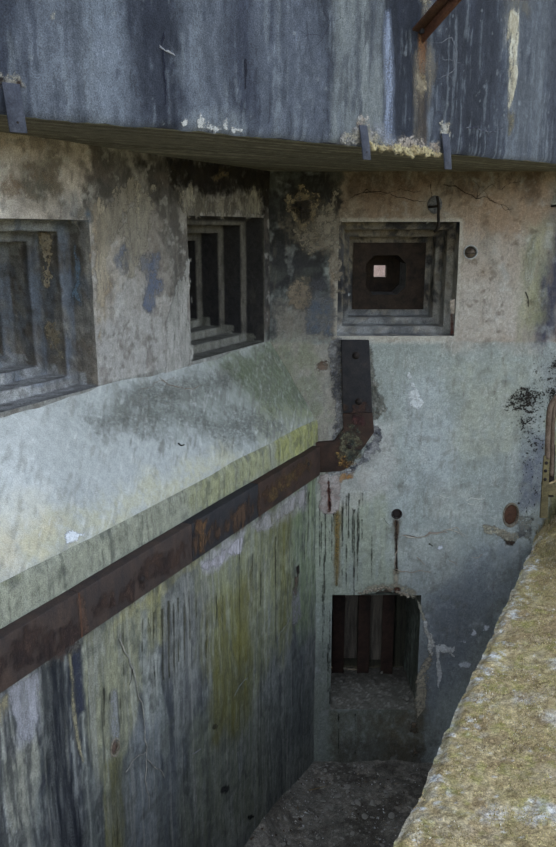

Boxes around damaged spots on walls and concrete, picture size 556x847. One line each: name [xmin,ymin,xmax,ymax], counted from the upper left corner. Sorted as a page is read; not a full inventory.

spalling [340,115,451,158]
rust [318,471,353,585]
water stain [142,593,197,680]
water stain [0,649,84,847]